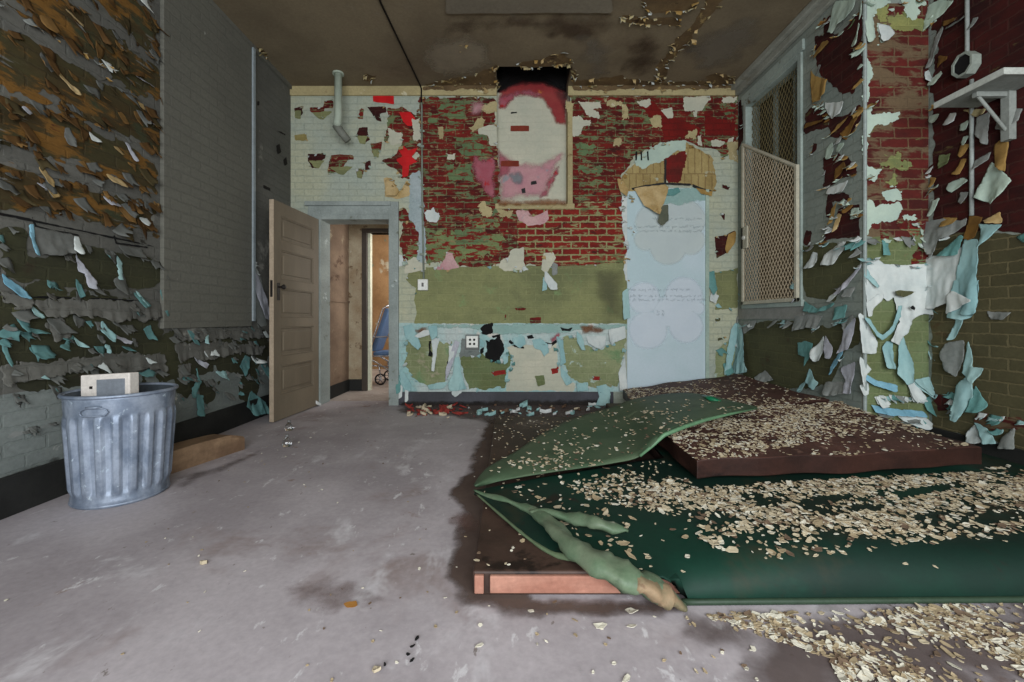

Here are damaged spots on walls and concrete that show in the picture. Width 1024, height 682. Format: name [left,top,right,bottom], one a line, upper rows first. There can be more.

peeling [276,131,308,165]
flaking render [294,100,334,120]
peeling [0,0,269,417]
peeling [308,0,1024,570]
peeling [706,603,1024,682]